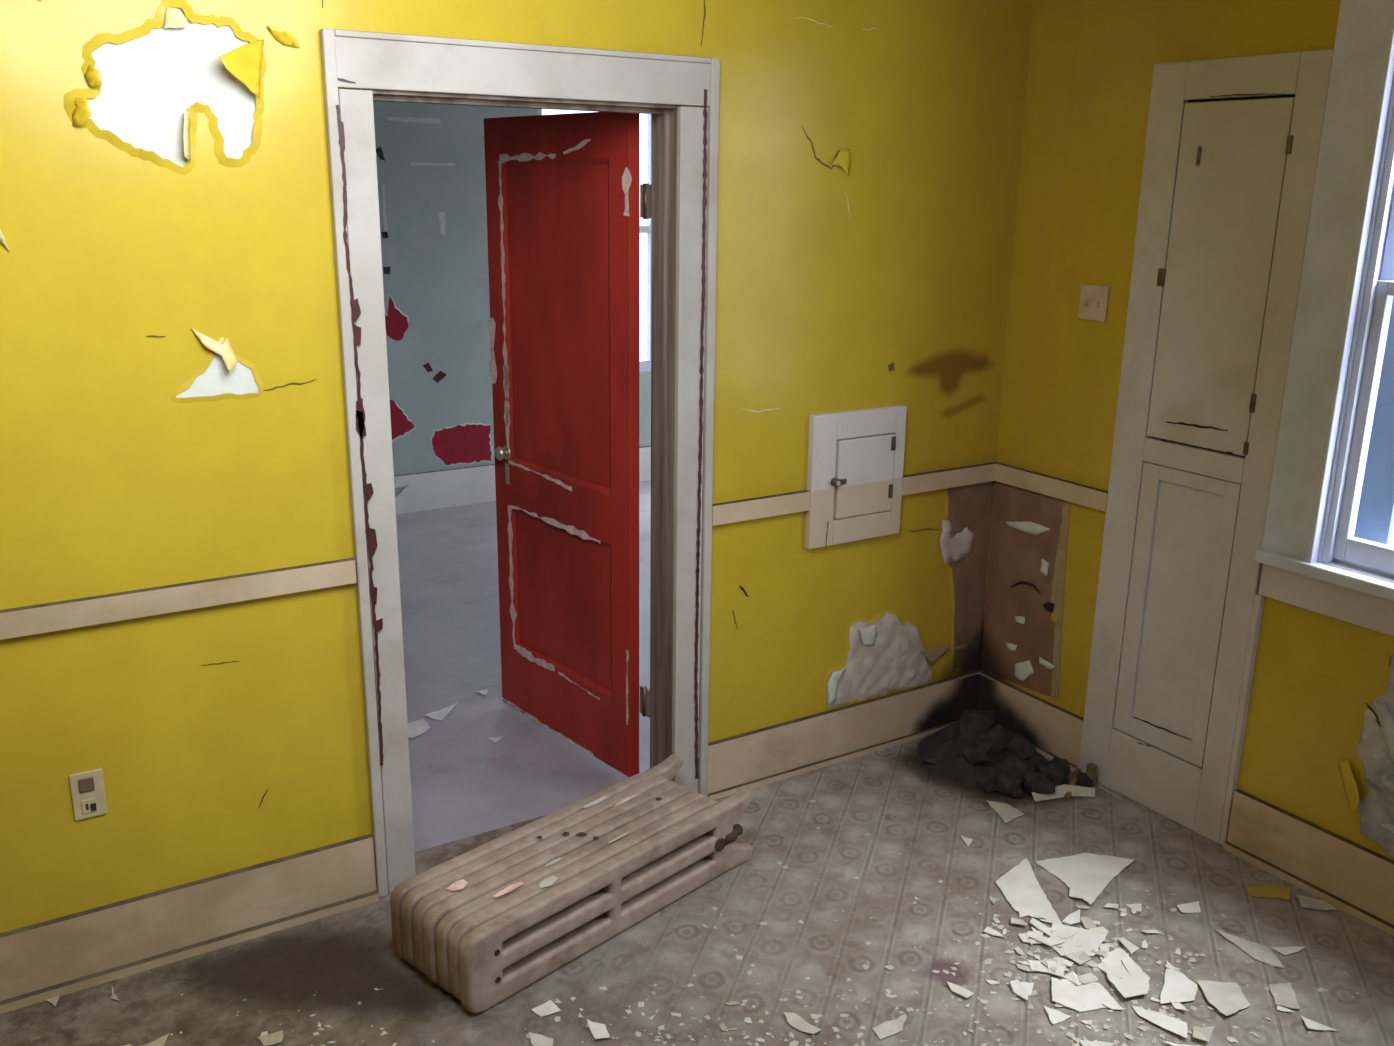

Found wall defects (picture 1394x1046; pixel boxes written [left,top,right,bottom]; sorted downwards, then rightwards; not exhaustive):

peeling [63,0,267,176]
crack [801,126,851,216]
peeling [170,327,316,403]
flaking render [822,481,1070,711]
flaking render [1337,648,1394,861]